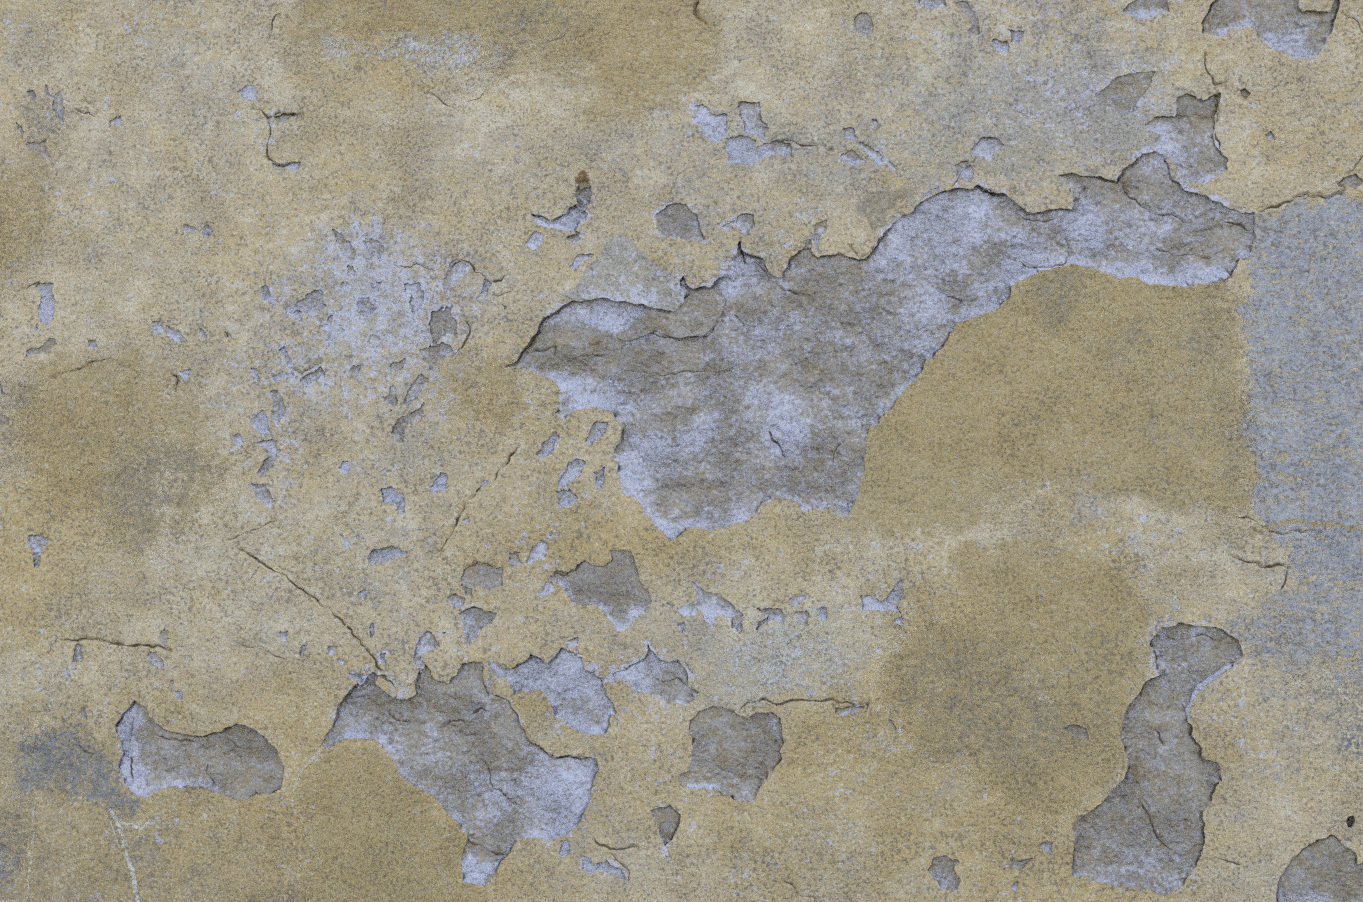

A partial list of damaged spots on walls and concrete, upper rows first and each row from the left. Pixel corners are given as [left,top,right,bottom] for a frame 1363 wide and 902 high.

flaking render [1201,0,1340,59]
peeling [230,346,325,504]
peeling [289,289,345,348]
peeling [381,486,409,514]
peeling [332,229,510,471]
peeling [429,472,448,492]
flaking render [505,59,1363,541]
crack [231,521,390,678]
flaking render [115,700,285,801]
flaking render [321,541,828,886]
flaking render [1010,617,1250,896]
flaking render [1276,830,1363,902]